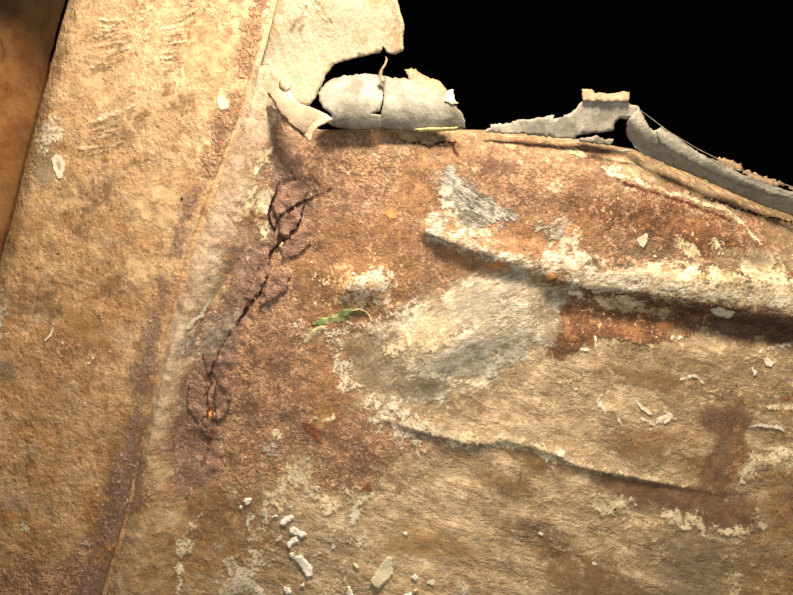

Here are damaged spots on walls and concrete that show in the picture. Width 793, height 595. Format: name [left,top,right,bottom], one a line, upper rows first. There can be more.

peeling [260,0,466,141]
peeling [484,89,793,216]
crack [201,167,333,464]
rust [148,116,793,595]
peeling [597,295,647,307]
peeling [674,235,701,260]
peeling [710,307,735,318]
rust [0,310,161,595]
leakage [591,471,761,533]